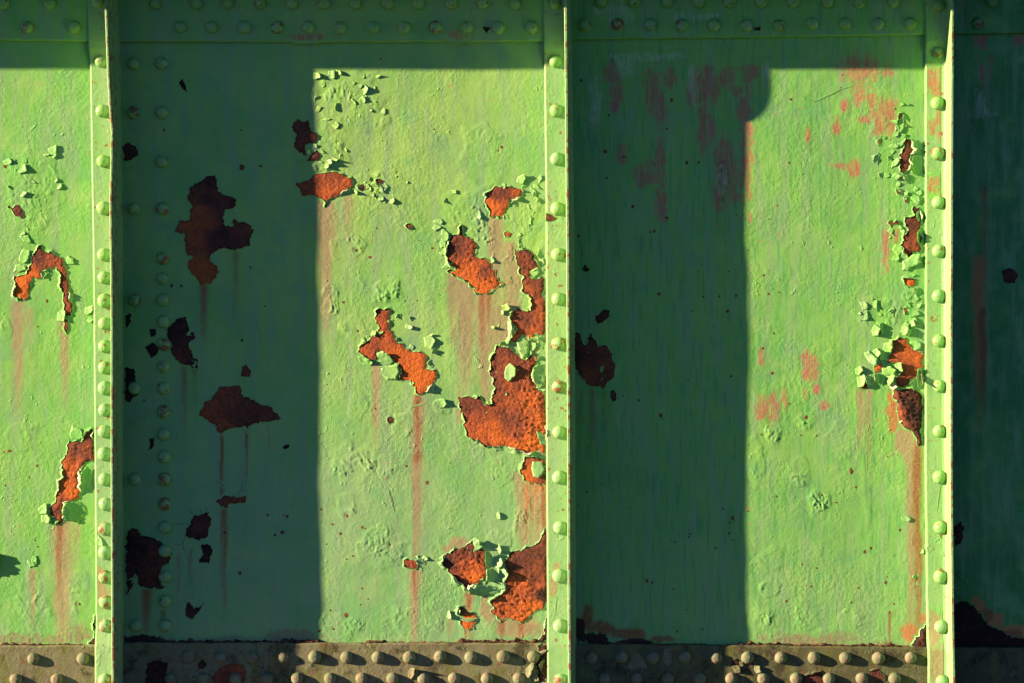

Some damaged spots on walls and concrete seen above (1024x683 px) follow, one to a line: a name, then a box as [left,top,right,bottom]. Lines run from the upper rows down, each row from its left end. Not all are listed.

corrosion [290,117,397,354]
peeling [292,65,414,209]
corrosion [872,103,925,288]
corrosion [0,204,96,645]
corrosion [124,173,547,683]
corrosion [575,308,640,506]